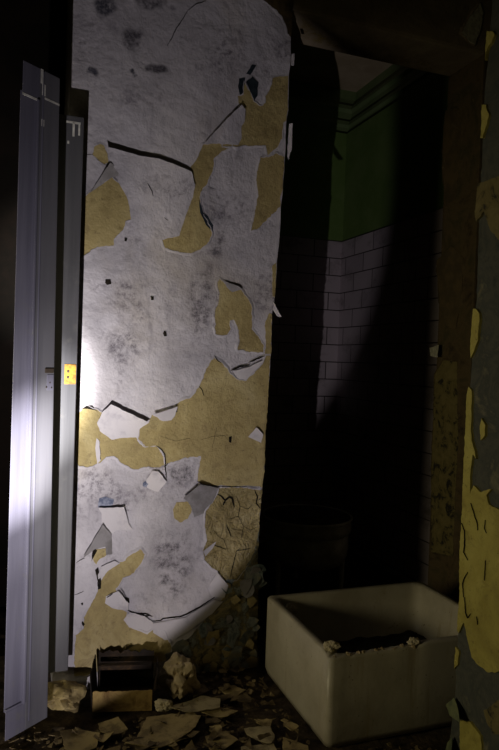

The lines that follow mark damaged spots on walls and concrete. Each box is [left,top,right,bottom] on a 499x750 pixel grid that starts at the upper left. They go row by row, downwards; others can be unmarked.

peeling [80,65,293,260]
peeling [480,105,491,139]
peeling [475,176,499,240]
peeling [470,309,482,358]
peeling [71,263,281,678]
crack [197,481,262,577]
crack [461,503,487,625]
peeling [454,387,499,673]
peeling [445,698,484,750]